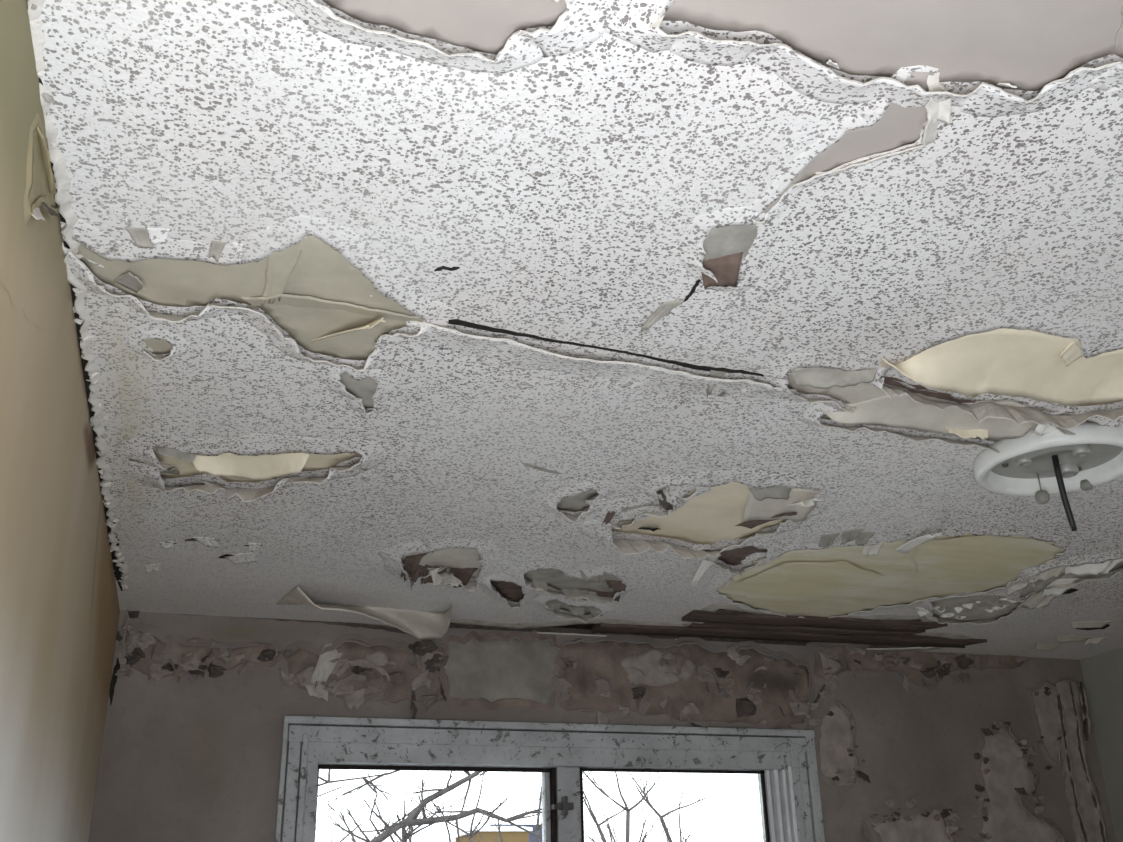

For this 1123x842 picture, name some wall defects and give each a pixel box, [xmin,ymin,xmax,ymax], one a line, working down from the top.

peeling [273,0,1123,331]
peeling [24,112,458,415]
crack [406,319,797,408]
peeling [757,310,1123,453]
peeling [124,432,391,502]
peeling [539,468,1123,625]
peeling [115,538,1030,787]
flaking render [866,678,1108,842]